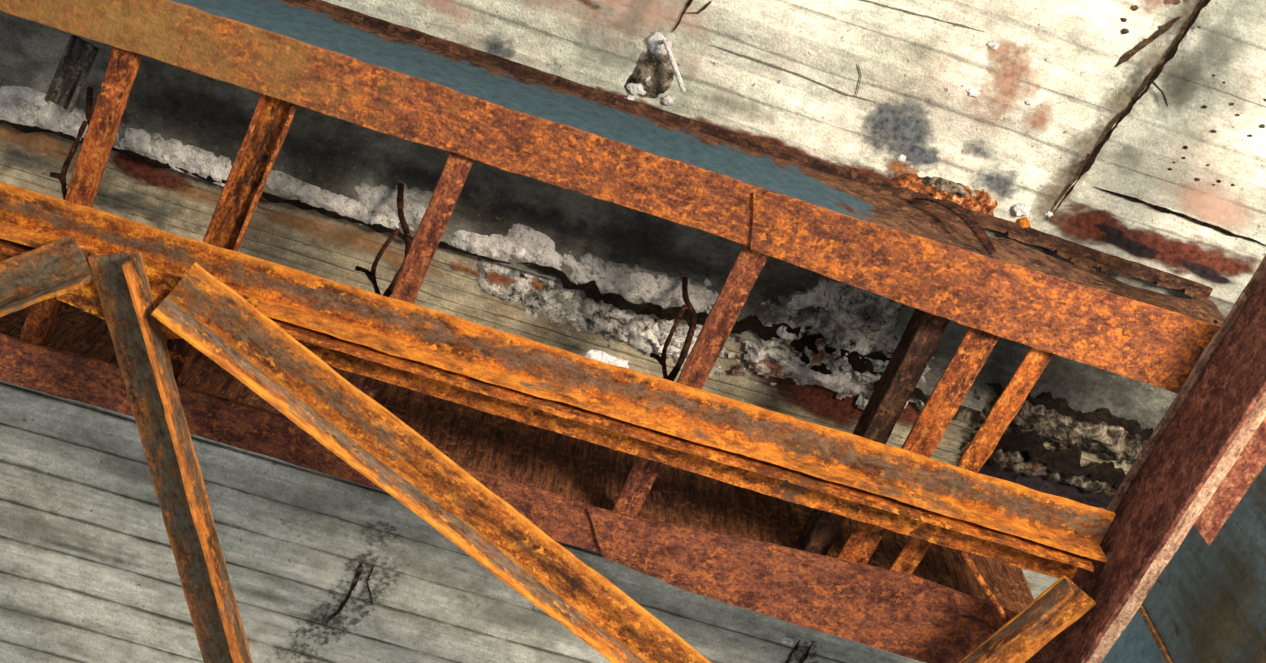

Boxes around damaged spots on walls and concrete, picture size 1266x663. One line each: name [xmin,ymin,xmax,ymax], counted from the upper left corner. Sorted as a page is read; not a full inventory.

spalling [624,32,680,106]
rust [697,118,998,216]
damp [864,103,938,171]
damp [964,144,991,158]
rust [966,40,1050,129]
damp [976,172,1053,229]
rust [1048,206,1256,278]
crack [1039,0,1266,246]
spalling [474,257,703,371]
spalling [712,273,906,410]
rust [758,374,864,427]
spalling [985,396,1155,497]